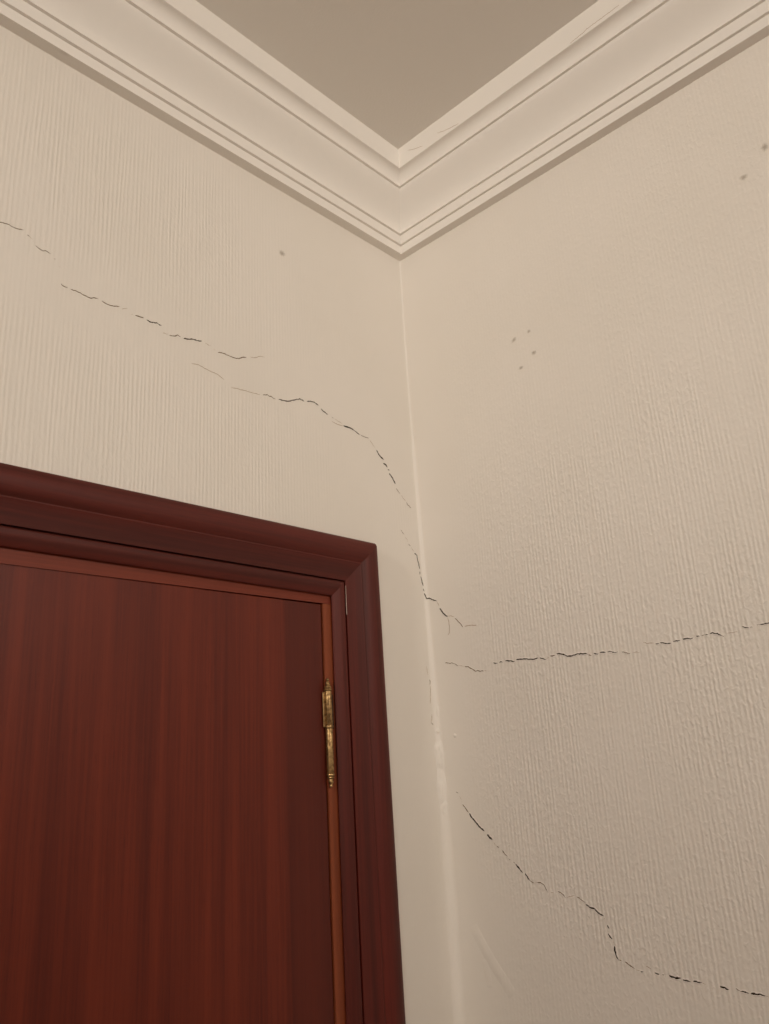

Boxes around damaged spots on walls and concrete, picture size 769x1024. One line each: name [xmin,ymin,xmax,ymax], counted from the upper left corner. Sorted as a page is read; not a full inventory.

crack [0,221,476,633]
crack [426,621,769,725]
crack [456,791,769,998]